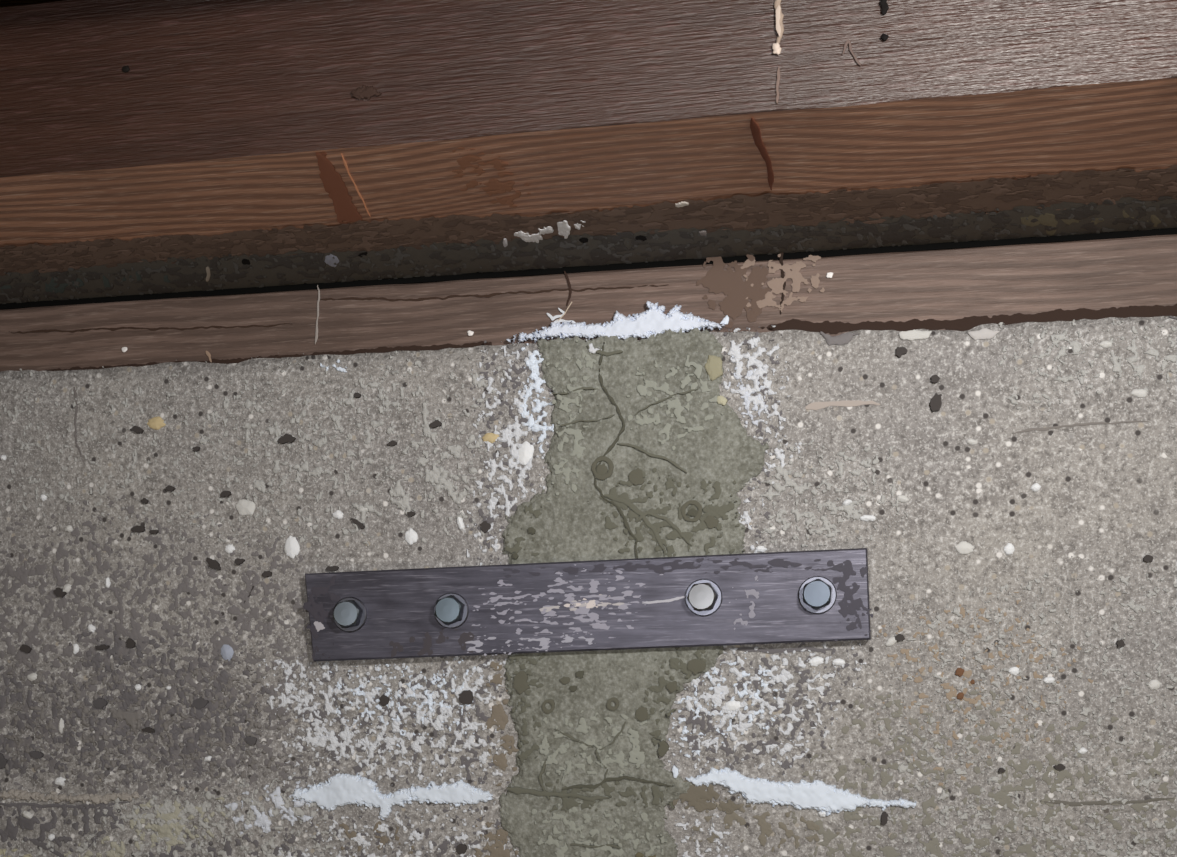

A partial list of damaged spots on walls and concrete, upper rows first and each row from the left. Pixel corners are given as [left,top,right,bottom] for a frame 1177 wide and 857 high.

leakage [43,362,159,376]
leakage [626,355,718,445]
leakage [1110,324,1177,386]
crack [552,342,699,558]
leakage [339,499,386,546]
crack [506,722,675,801]
leakage [637,605,1177,857]